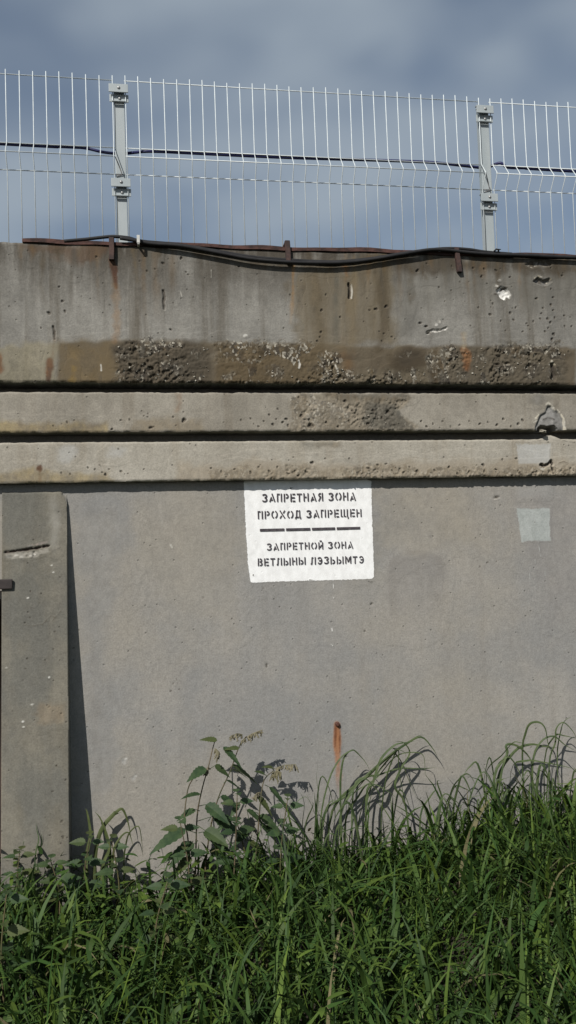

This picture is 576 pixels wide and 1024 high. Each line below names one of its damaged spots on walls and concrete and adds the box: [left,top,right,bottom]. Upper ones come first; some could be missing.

water stain [0,242,576,383]
spalling [97,258,576,433]
corrosion [330,718,346,799]